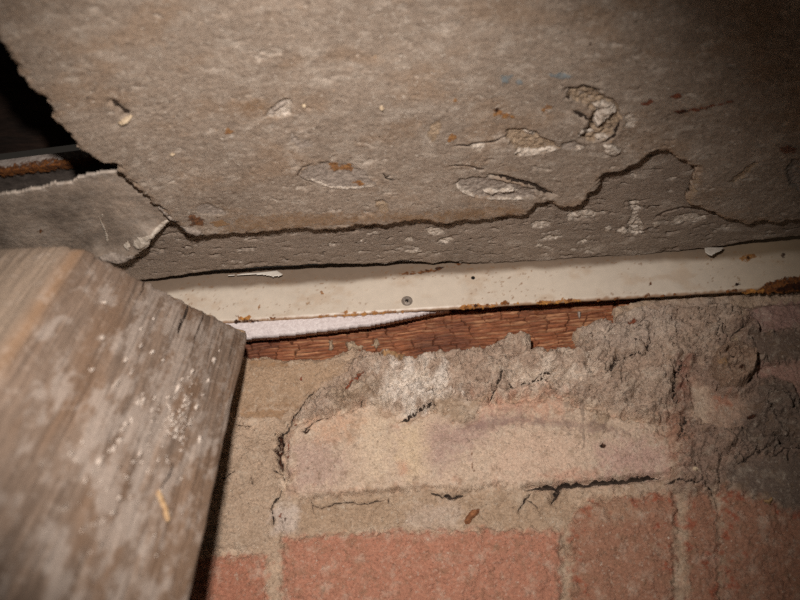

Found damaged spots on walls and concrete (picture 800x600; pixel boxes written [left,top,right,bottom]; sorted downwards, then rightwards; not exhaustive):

flaking render [0,0,800,247]
rust [0,155,108,177]
crack [453,165,552,193]
crack [640,205,694,231]
rust [726,276,800,294]
rust [460,300,519,310]
crack [274,392,329,436]
crack [401,402,436,422]
crack [271,470,285,525]
crack [311,498,389,514]
crack [431,492,463,500]